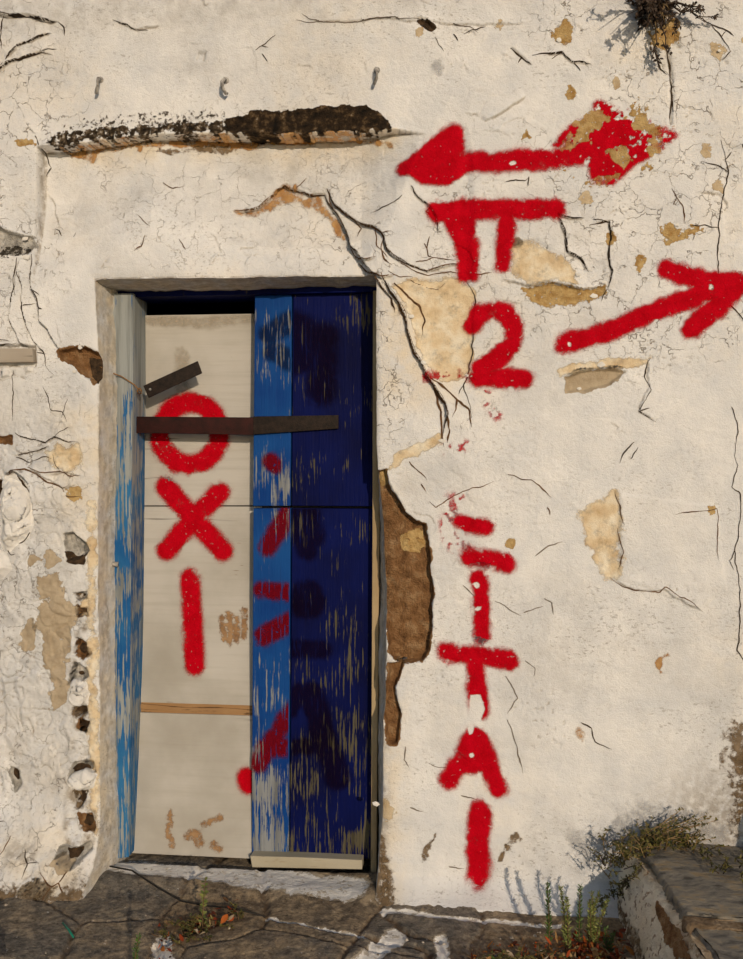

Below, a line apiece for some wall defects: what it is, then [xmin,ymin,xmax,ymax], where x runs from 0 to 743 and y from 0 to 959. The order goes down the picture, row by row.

crack [0,11,65,69]
crack [299,13,418,23]
crack [672,141,743,273]
flaking render [0,226,39,260]
flaking render [511,237,607,308]
crack [237,180,491,445]
crack [0,254,80,497]
flaking render [56,345,103,385]
flaking render [557,357,648,394]
flaking render [378,433,445,747]
flaking render [18,532,92,731]
leakage [732,753,743,822]